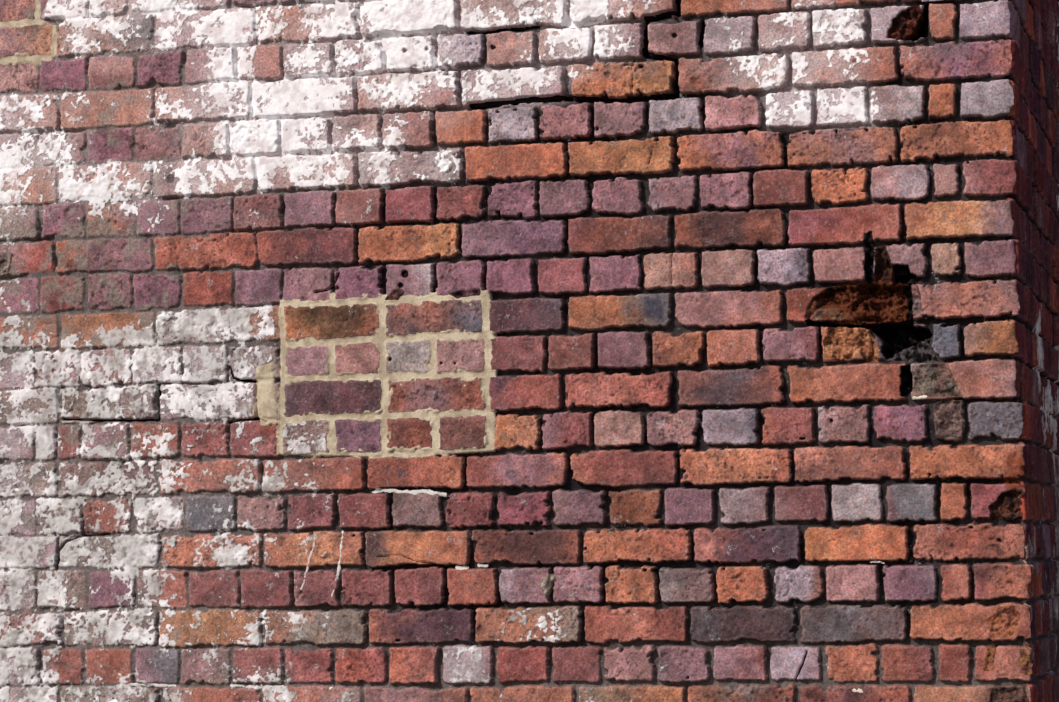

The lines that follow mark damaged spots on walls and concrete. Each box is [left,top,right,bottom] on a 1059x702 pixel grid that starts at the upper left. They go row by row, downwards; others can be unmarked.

peeling [704,0,933,152]
peeling [0,0,656,702]
spalling [799,244,990,452]
spalling [967,488,1025,520]
damp [1020,304,1059,681]
spalling [968,605,1020,671]
spalling [989,687,1029,702]
spalling [1019,644,1033,675]